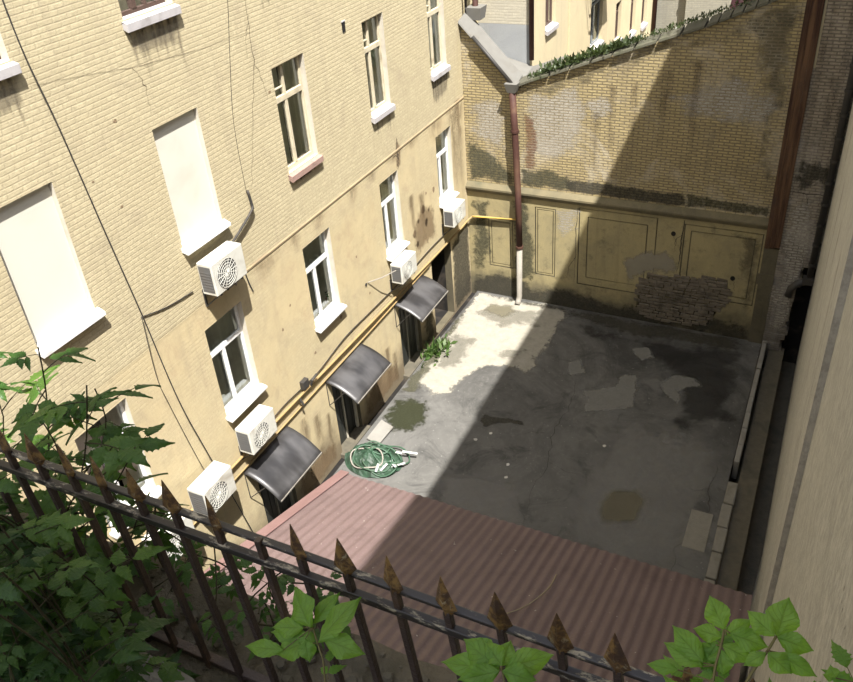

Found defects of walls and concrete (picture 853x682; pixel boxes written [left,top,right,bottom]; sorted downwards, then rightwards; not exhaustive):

crack [34,2,268,186]
leakage [369,367,398,411]
leakage [383,202,746,432]
spalling [633,272,735,326]